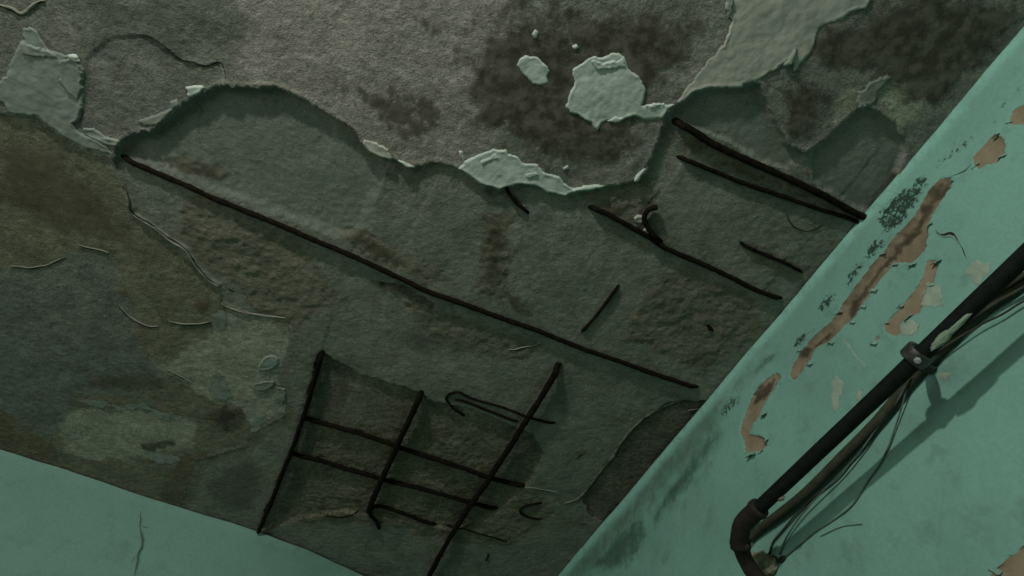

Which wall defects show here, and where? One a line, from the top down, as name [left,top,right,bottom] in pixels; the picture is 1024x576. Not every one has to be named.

peeling [20,42,84,100]
water stain [326,79,451,139]
water stain [454,0,702,169]
rust [671,117,867,224]
peeling [971,105,1024,169]
rust [121,154,699,389]
spalling [112,83,908,576]
rust [588,205,782,300]
rust [739,241,803,273]
peeling [740,177,953,458]
rust [256,350,562,576]